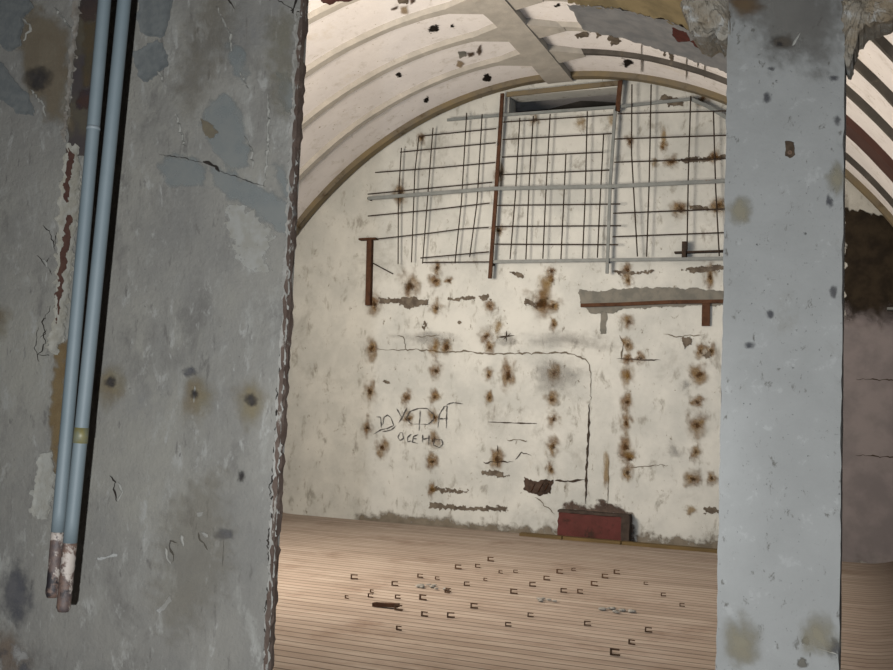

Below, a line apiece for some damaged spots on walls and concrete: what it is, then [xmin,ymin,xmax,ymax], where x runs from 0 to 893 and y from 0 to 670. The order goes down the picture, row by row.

peeling [0,62,46,116]
leakage [20,11,71,125]
peeling [457,45,482,68]
crack [159,154,259,185]
crack [38,227,57,273]
crack [34,308,50,360]
peeling [224,8,302,670]
rust [534,268,558,327]
rust [622,339,645,383]
rust [580,299,723,326]
rust [621,394,634,479]
peeling [28,452,56,520]